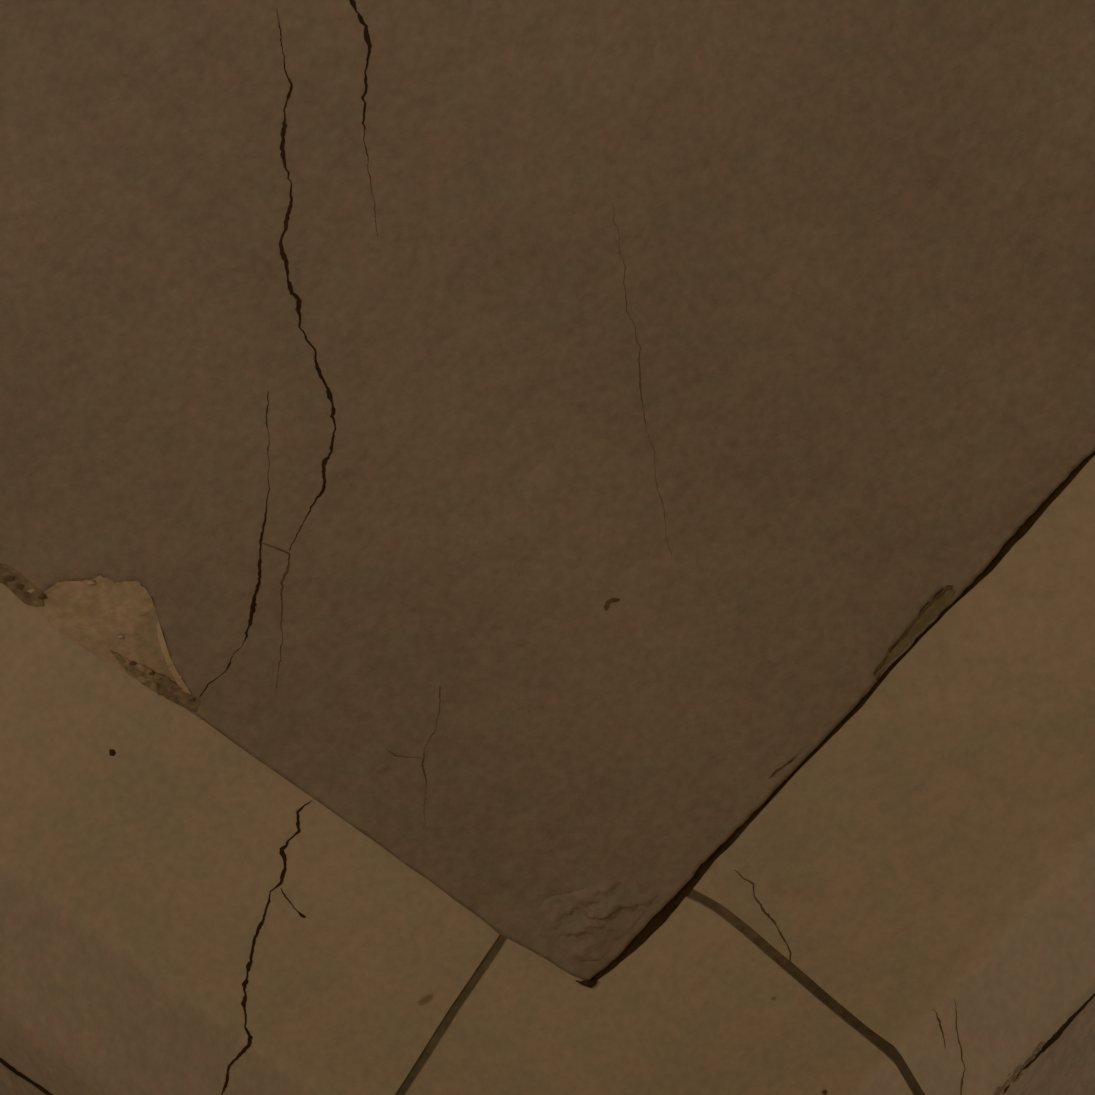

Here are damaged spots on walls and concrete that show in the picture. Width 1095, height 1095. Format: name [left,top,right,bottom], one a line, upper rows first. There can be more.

crack [349,0,378,236]
crack [199,10,336,697]
spalling [0,563,201,712]
crack [221,801,311,1095]